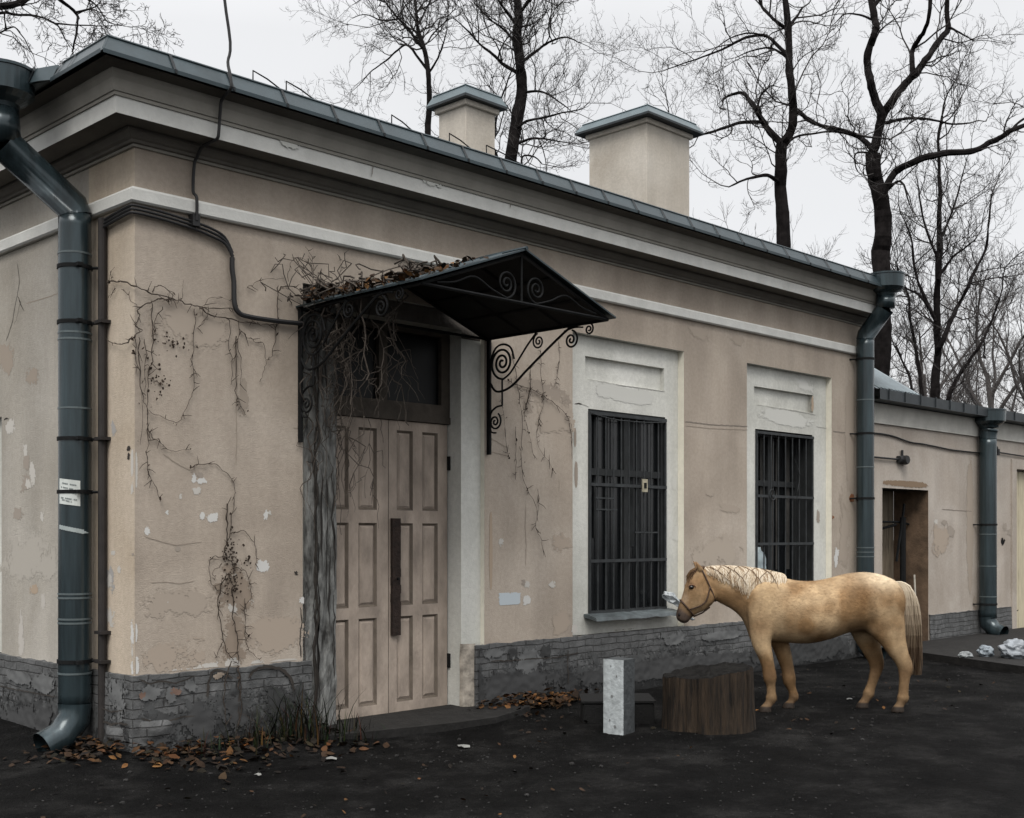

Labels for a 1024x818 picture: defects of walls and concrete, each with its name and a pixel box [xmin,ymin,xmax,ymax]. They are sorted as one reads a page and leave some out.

spalling [20,444,36,493]
spalling [179,473,207,499]
spalling [200,512,218,523]
peeling [0,507,58,610]
spalling [256,559,270,572]
peeling [7,670,55,695]
peeling [105,619,297,725]
peeling [484,646,544,674]